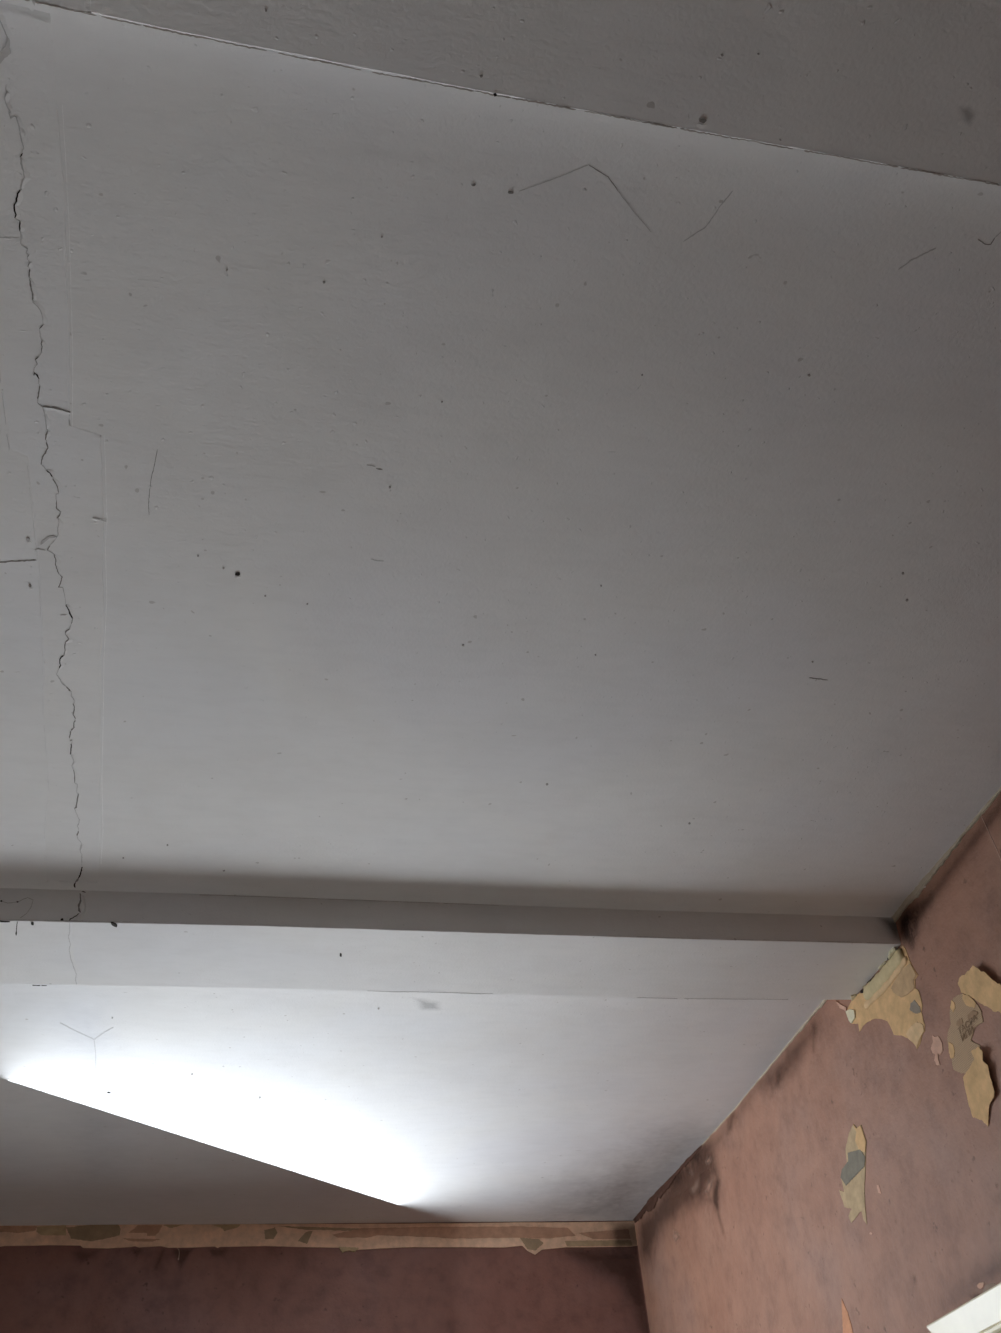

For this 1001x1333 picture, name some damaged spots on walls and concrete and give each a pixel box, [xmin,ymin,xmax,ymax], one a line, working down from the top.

crack [0,0,107,921]
spalling [835,946,1001,1126]
peeling [0,1221,638,1255]
peeling [839,1124,881,1224]